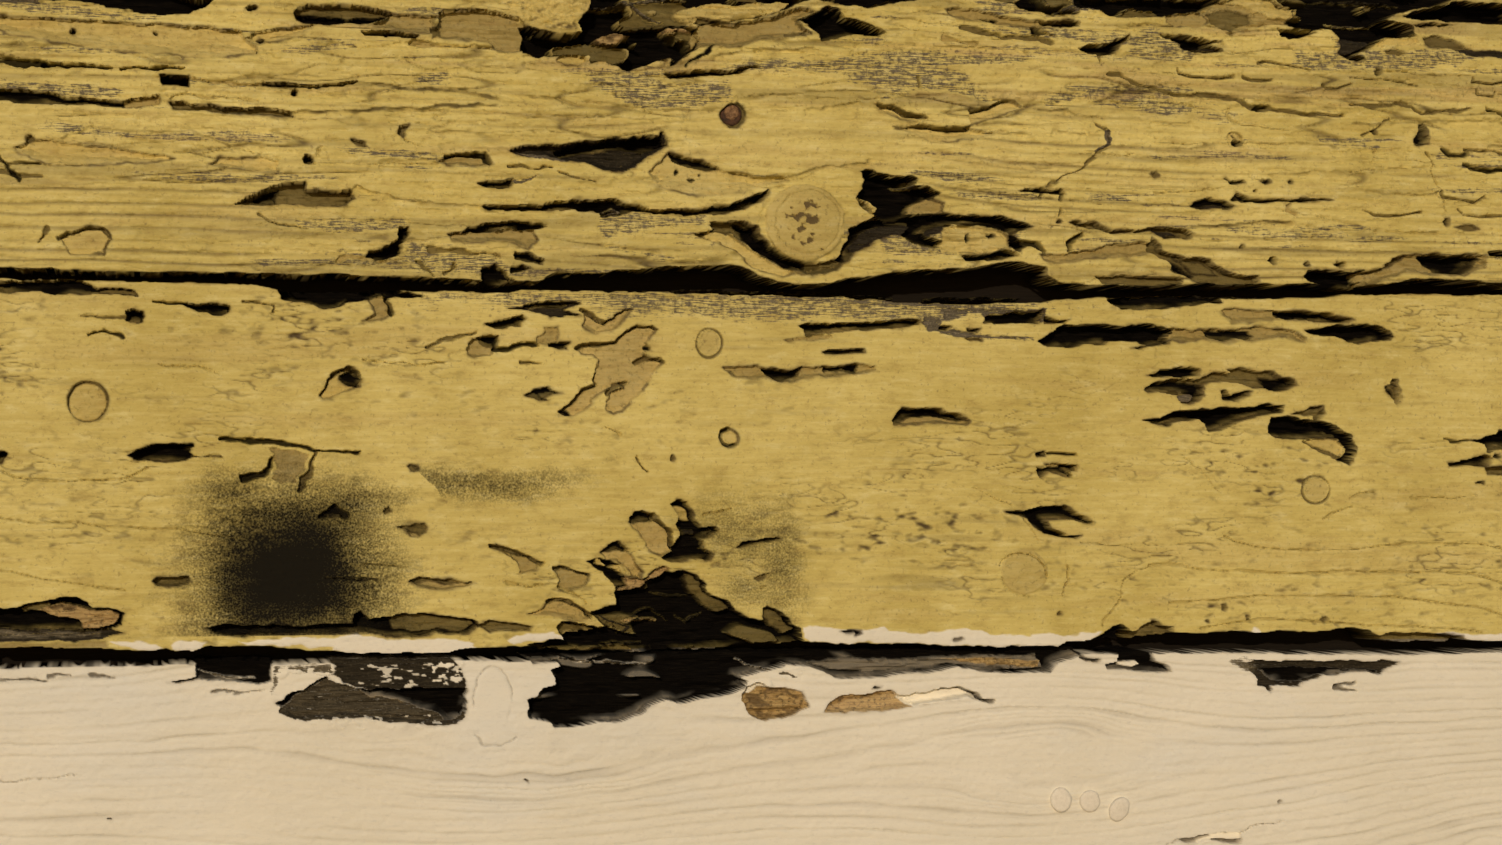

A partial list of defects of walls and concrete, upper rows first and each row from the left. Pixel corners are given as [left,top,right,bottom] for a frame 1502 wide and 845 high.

spalling [0,14,386,59]
spalling [940,6,1080,48]
spalling [13,80,874,206]
peeling [1362,143,1502,237]
spalling [730,225,804,271]
spalling [1040,241,1192,293]
spalling [1416,255,1484,275]
spalling [1157,310,1354,344]
spalling [600,510,675,578]
spalling [487,542,593,622]
peeling [271,653,468,727]
spalling [823,685,997,714]